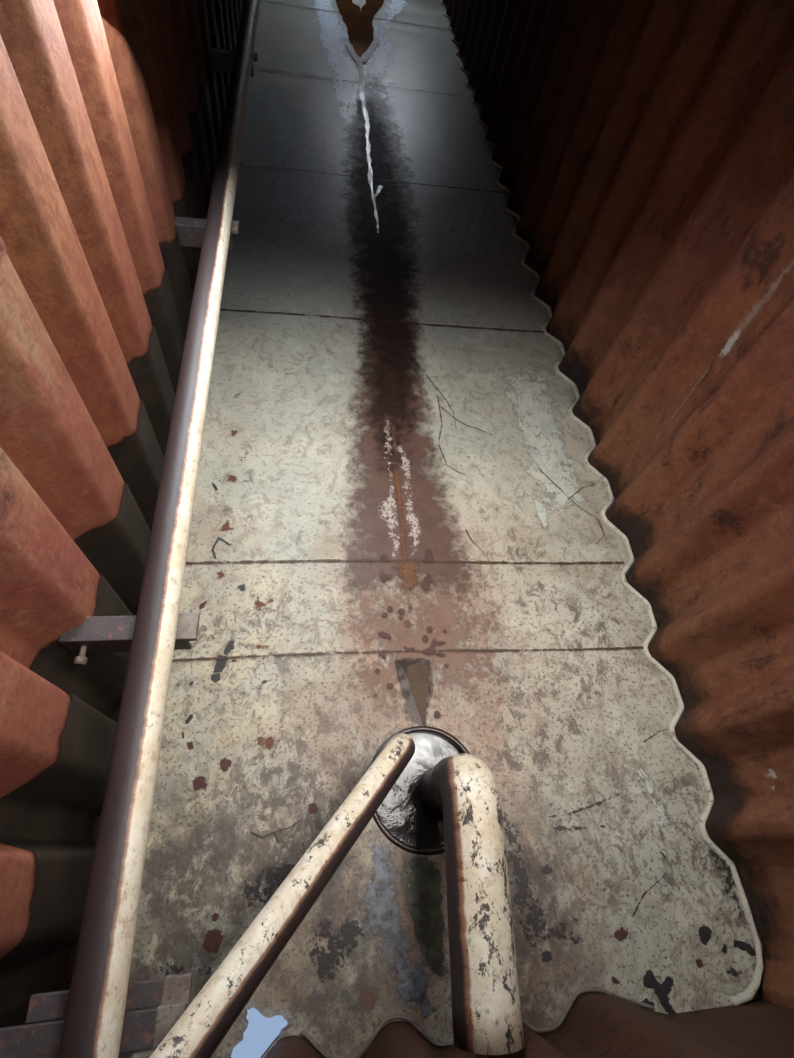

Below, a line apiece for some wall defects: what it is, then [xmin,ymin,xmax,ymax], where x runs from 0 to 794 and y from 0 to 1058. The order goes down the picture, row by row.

water stain [244,0,507,726]
crack [425,374,492,475]
corrosion [380,425,434,627]
crack [538,468,605,544]
corrosion [375,631,392,673]
corrosion [403,626,449,667]
peeling [699,925,712,945]
peeling [722,940,756,956]
peeling [642,957,677,1015]